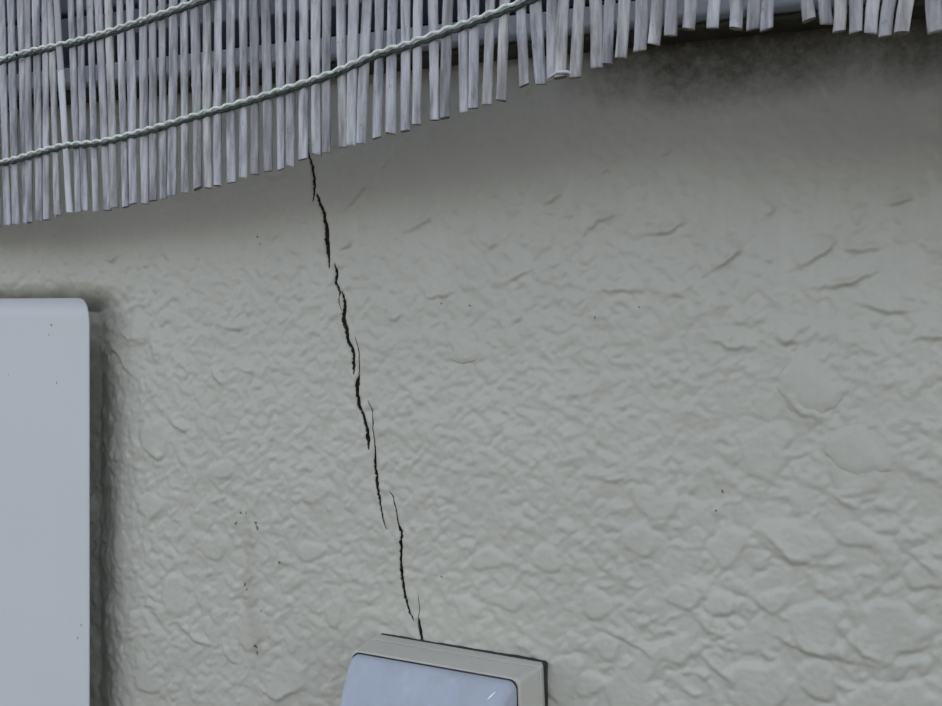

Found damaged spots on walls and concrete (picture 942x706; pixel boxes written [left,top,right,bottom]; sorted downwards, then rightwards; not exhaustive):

crack [308,149,423,639]